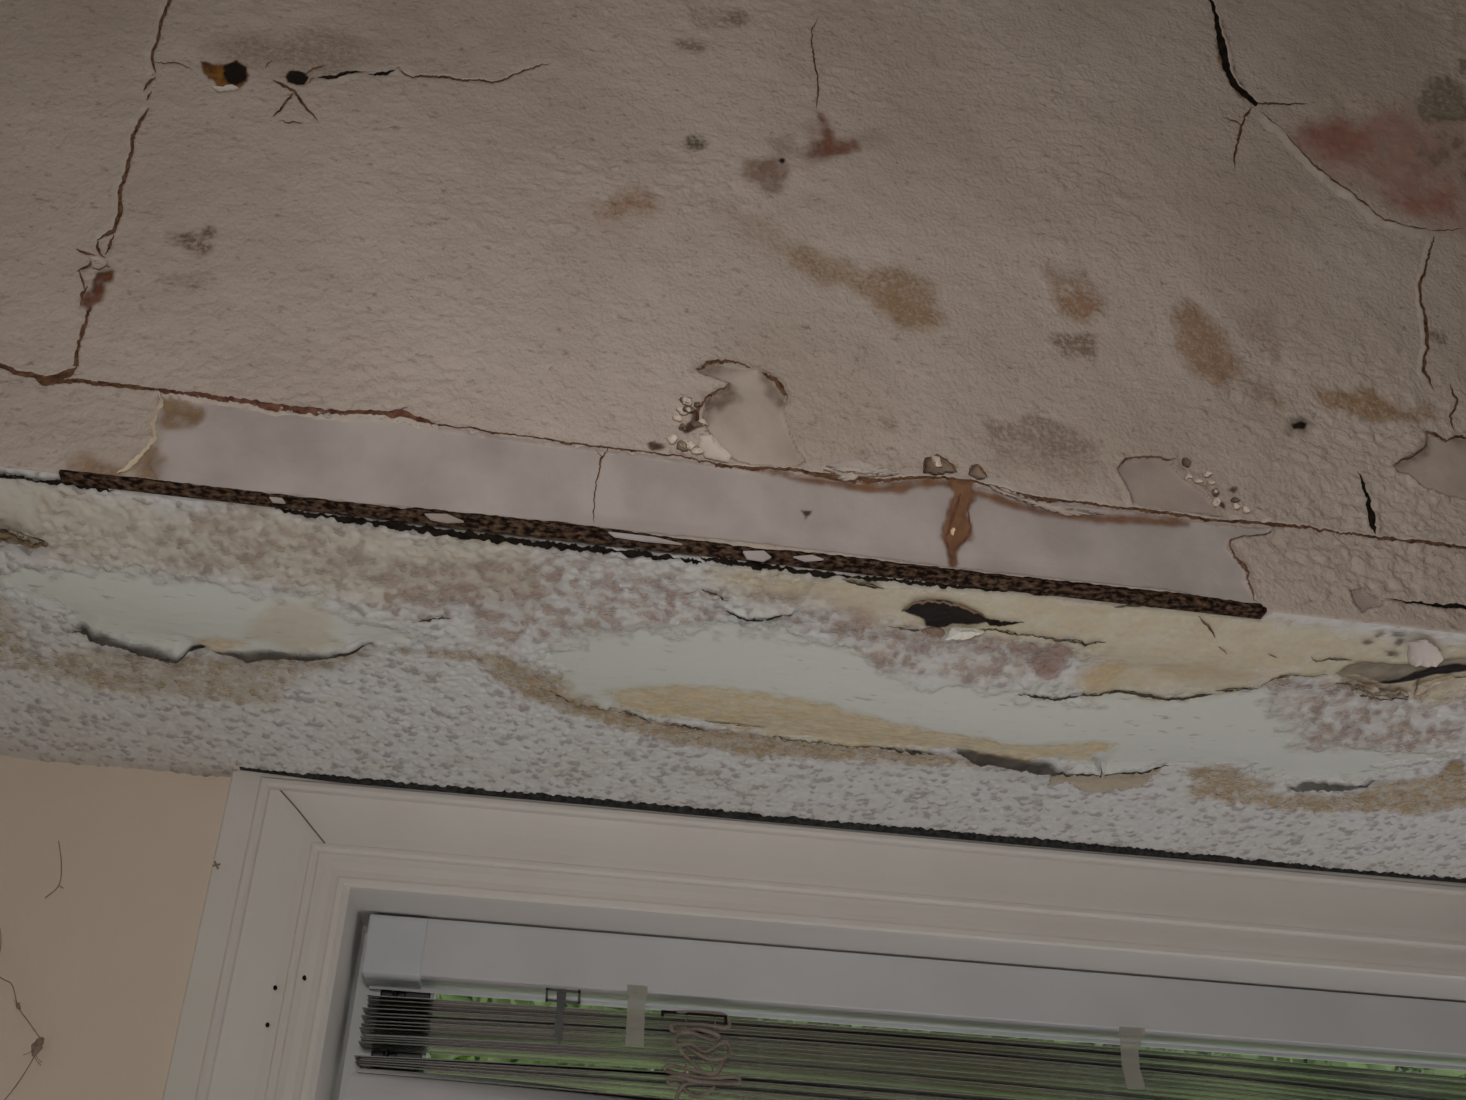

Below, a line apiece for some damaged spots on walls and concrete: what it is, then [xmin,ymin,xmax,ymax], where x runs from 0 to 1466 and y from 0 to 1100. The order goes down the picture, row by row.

crack [95,0,191,240]
rust [813,116,855,155]
damp [1297,59,1466,206]
crack [1209,0,1462,431]
damp [796,251,933,326]
damp [1176,307,1233,384]
crack [0,306,1466,549]
spalling [0,524,49,549]
peeling [117,359,1272,603]
rust [795,478,1183,566]
peeling [1407,640,1444,667]
peeling [1047,769,1159,793]